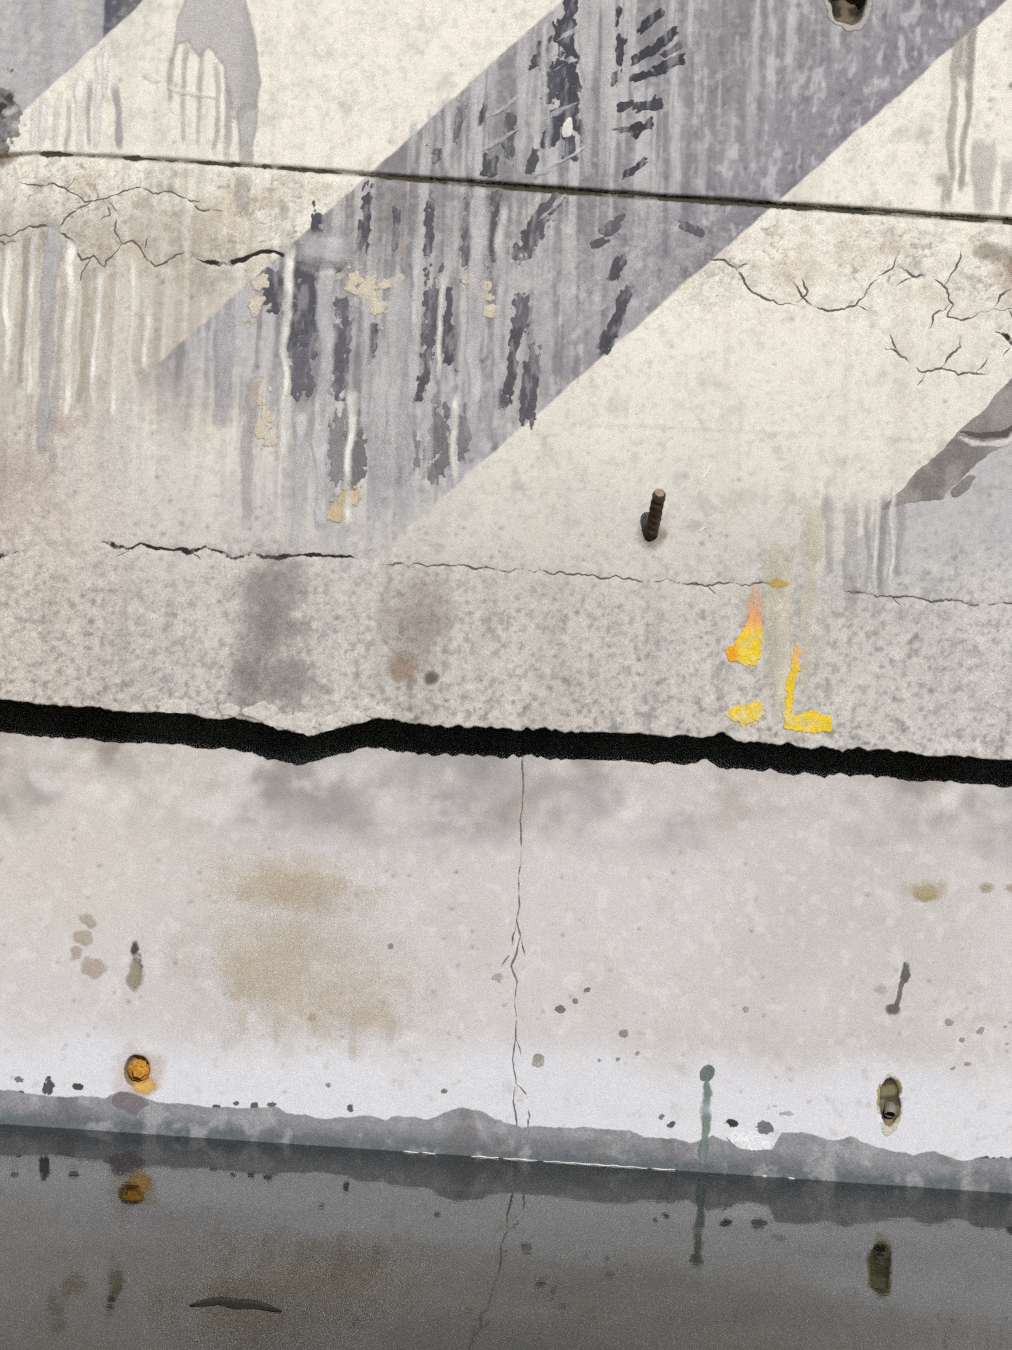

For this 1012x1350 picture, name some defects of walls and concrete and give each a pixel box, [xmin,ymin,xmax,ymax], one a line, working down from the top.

spalling [0,88,23,165]
damp [144,0,261,160]
damp [2,221,150,450]
crack [0,178,358,282]
peeling [243,180,405,522]
peeling [413,0,586,485]
peeling [596,254,632,355]
crack [710,248,1012,385]
peeling [882,378,1012,509]
crack [101,541,354,560]
crack [388,562,769,594]
rust [134,1076,155,1094]